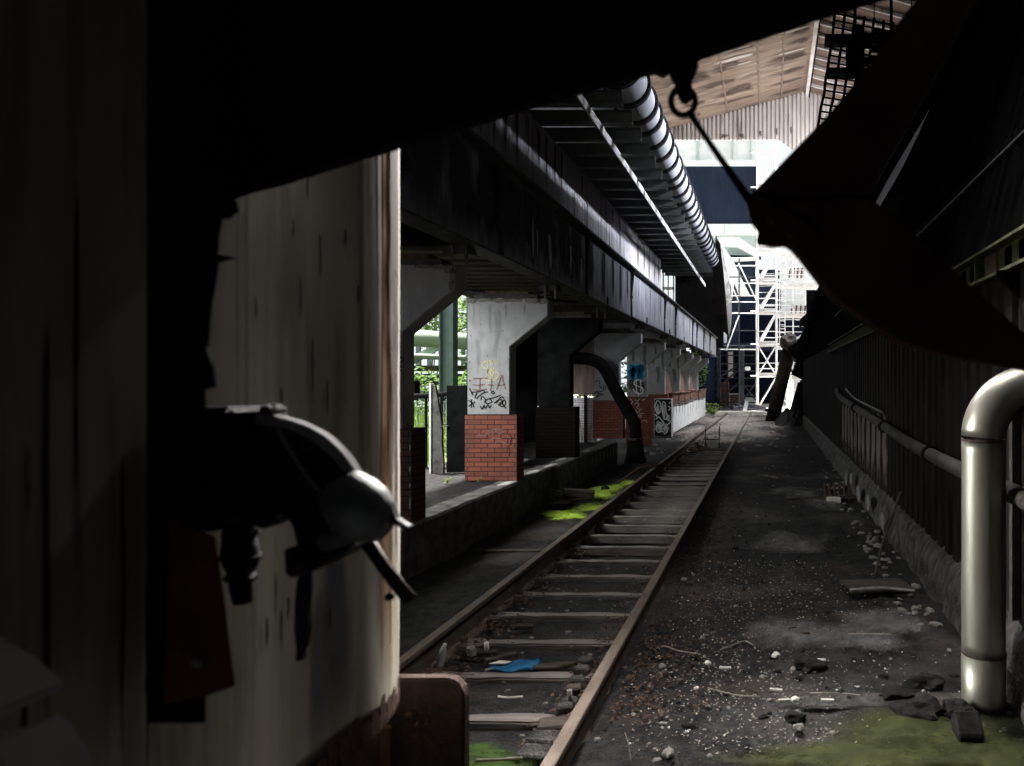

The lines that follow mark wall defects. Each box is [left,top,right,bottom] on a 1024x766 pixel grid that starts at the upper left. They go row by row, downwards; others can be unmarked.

water stain [493,114,563,190]
water stain [532,204,628,299]
rust [382,150,399,504]